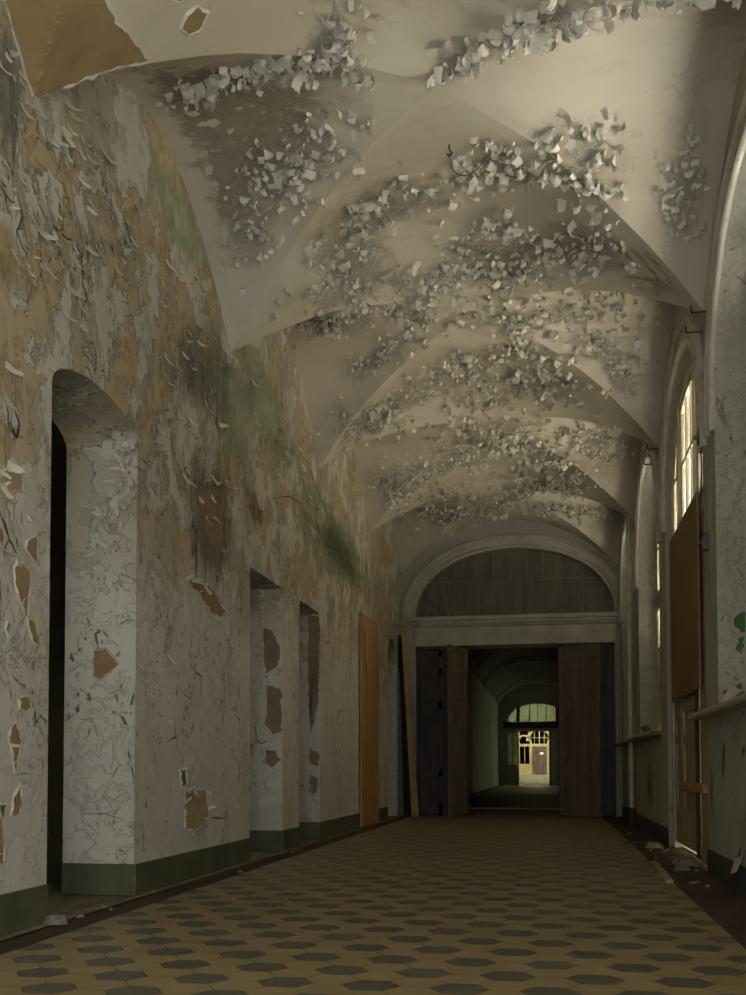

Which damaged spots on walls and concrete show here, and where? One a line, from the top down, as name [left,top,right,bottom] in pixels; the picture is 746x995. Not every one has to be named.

peeling [155,0,382,118]
peeling [208,108,376,269]
peeling [653,123,711,242]
spalling [0,0,237,526]
peeling [273,106,662,546]
leakage [178,327,230,582]
peeling [92,647,119,681]
peeling [186,569,233,623]
peeling [263,628,280,674]
peeling [264,686,282,735]
peeling [307,616,320,732]
peeling [179,766,217,837]